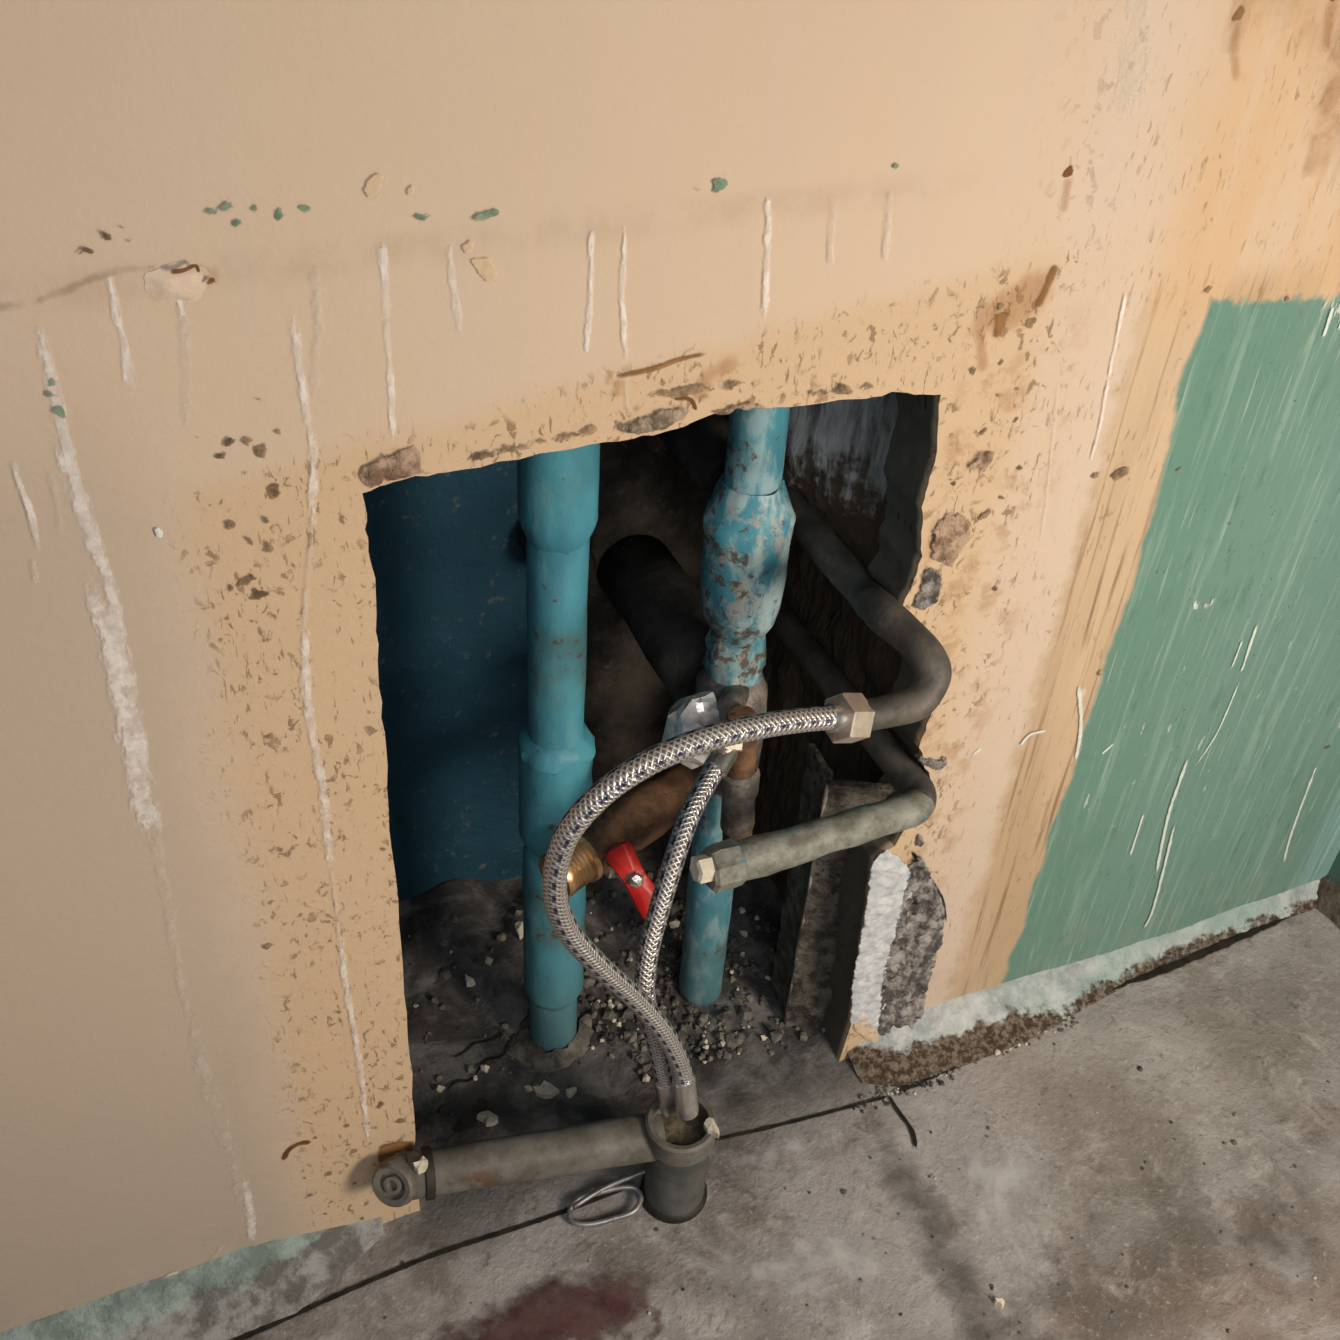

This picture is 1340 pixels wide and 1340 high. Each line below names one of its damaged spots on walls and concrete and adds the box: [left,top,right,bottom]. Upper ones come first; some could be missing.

corrosion [1036,266,1057,307]
water stain [107,277,131,380]
corrosion [995,313,1008,337]
water stain [39,334,67,428]
flaking render [616,381,766,434]
peeling [215,437,267,459]
water stain [14,471,38,539]
flaking render [913,496,1004,610]
water stain [56,445,159,828]
flaking render [850,835,947,1043]
peeling [704,1117,720,1139]
peeling [413,1156,428,1174]